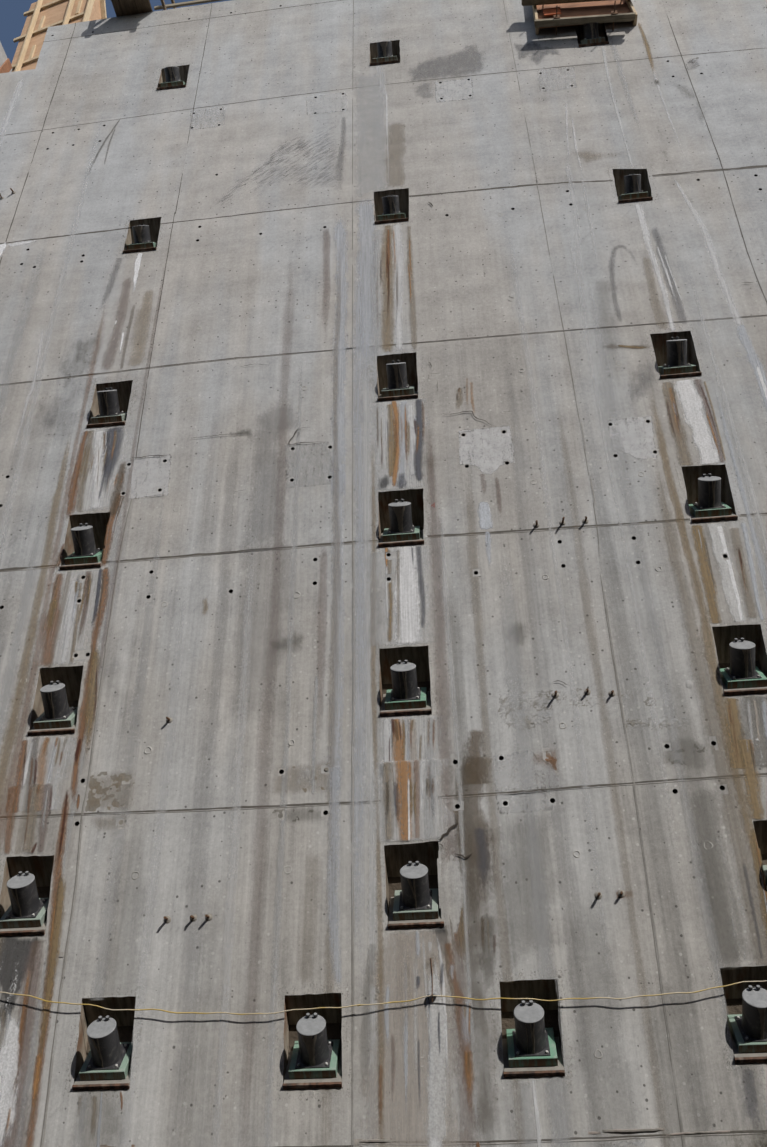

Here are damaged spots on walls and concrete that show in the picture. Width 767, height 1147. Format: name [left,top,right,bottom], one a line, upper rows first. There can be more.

rust [374,218,411,349]
rust [376,394,423,489]
rust [0,421,128,1147]
spalling [85,772,135,825]
rust [380,709,438,840]